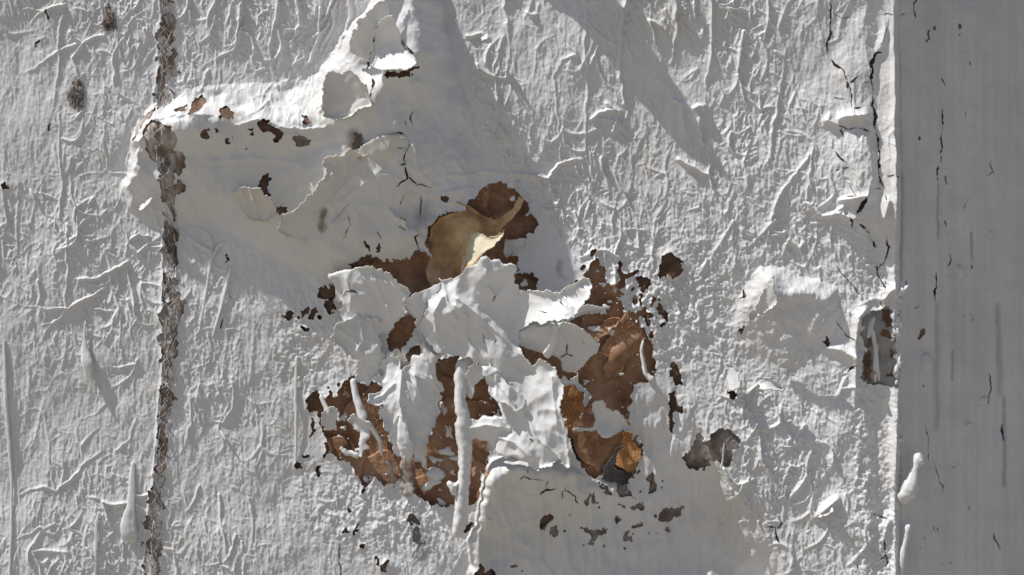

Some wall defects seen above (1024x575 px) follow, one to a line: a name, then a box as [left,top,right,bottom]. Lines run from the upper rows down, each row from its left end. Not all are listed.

peeling [349,0,420,79]
peeling [173,94,207,115]
peeling [200,106,235,144]
peeling [258,173,288,215]
peeling [249,115,312,147]
peeling [321,69,372,120]
crack [394,111,430,249]
crack [826,0,917,309]
crack [132,0,187,575]
peeling [282,181,684,550]
peeling [860,307,899,389]
peeling [682,427,741,471]